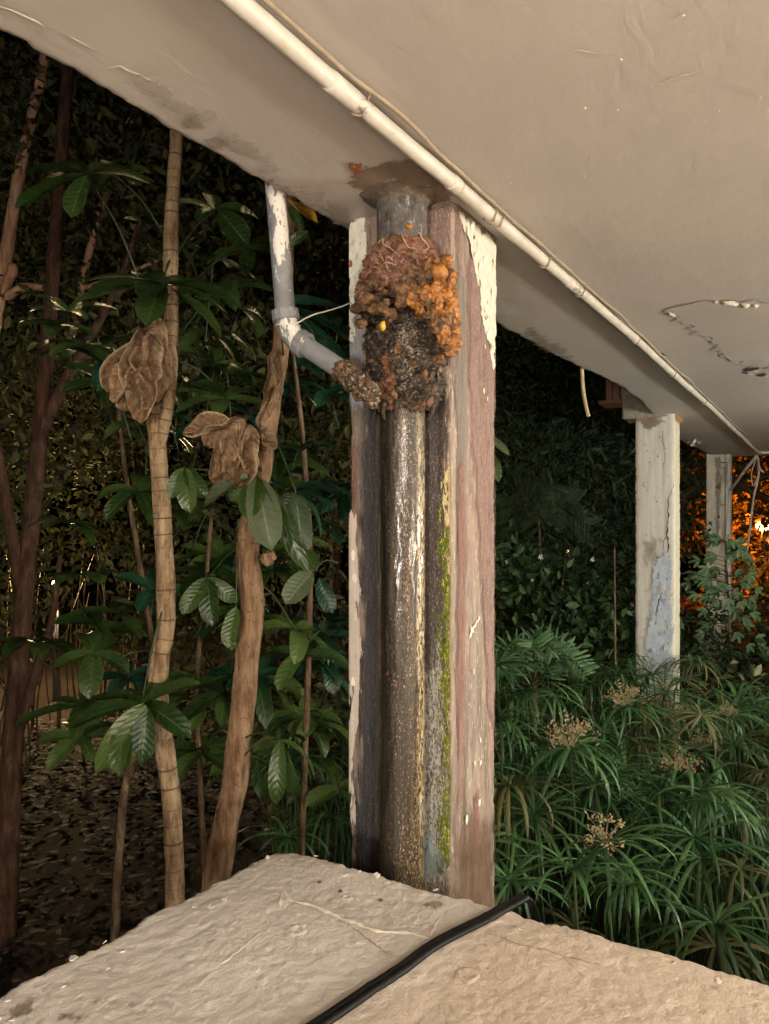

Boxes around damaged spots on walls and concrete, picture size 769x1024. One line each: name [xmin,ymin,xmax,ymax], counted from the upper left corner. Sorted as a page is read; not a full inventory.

rust [348,163,363,176]
leakage [349,159,496,244]
peeling [664,300,769,377]
peeling [427,205,497,725]
crack [662,437,674,553]
leakage [425,273,468,897]
crack [221,931,262,964]
crack [277,891,439,955]